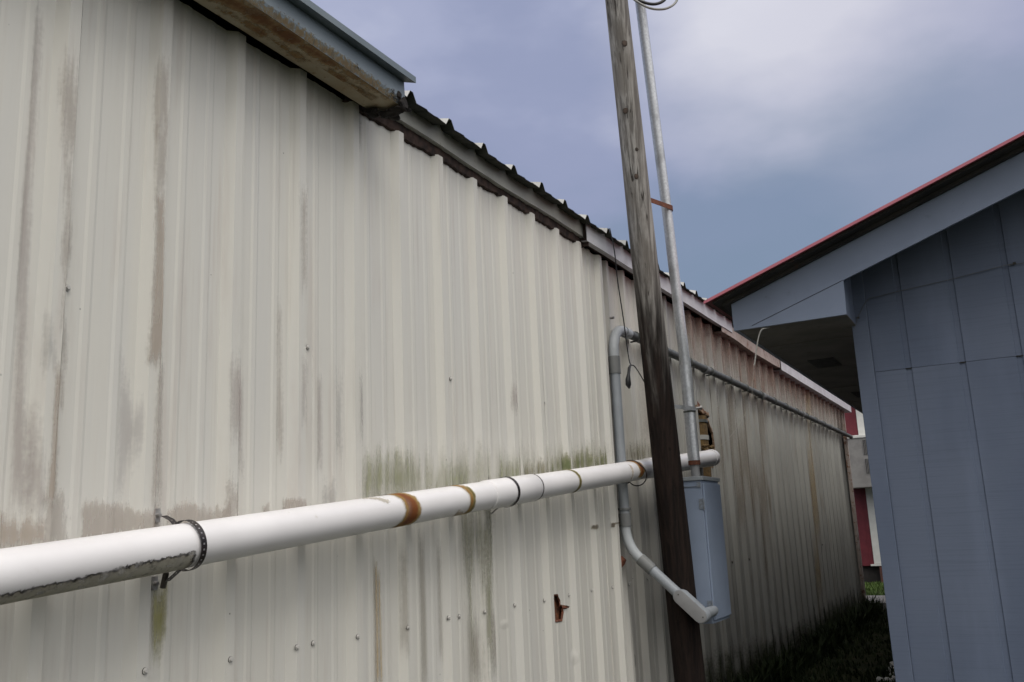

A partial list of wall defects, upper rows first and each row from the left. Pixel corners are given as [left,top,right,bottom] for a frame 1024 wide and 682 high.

corrosion [208,0,397,101]